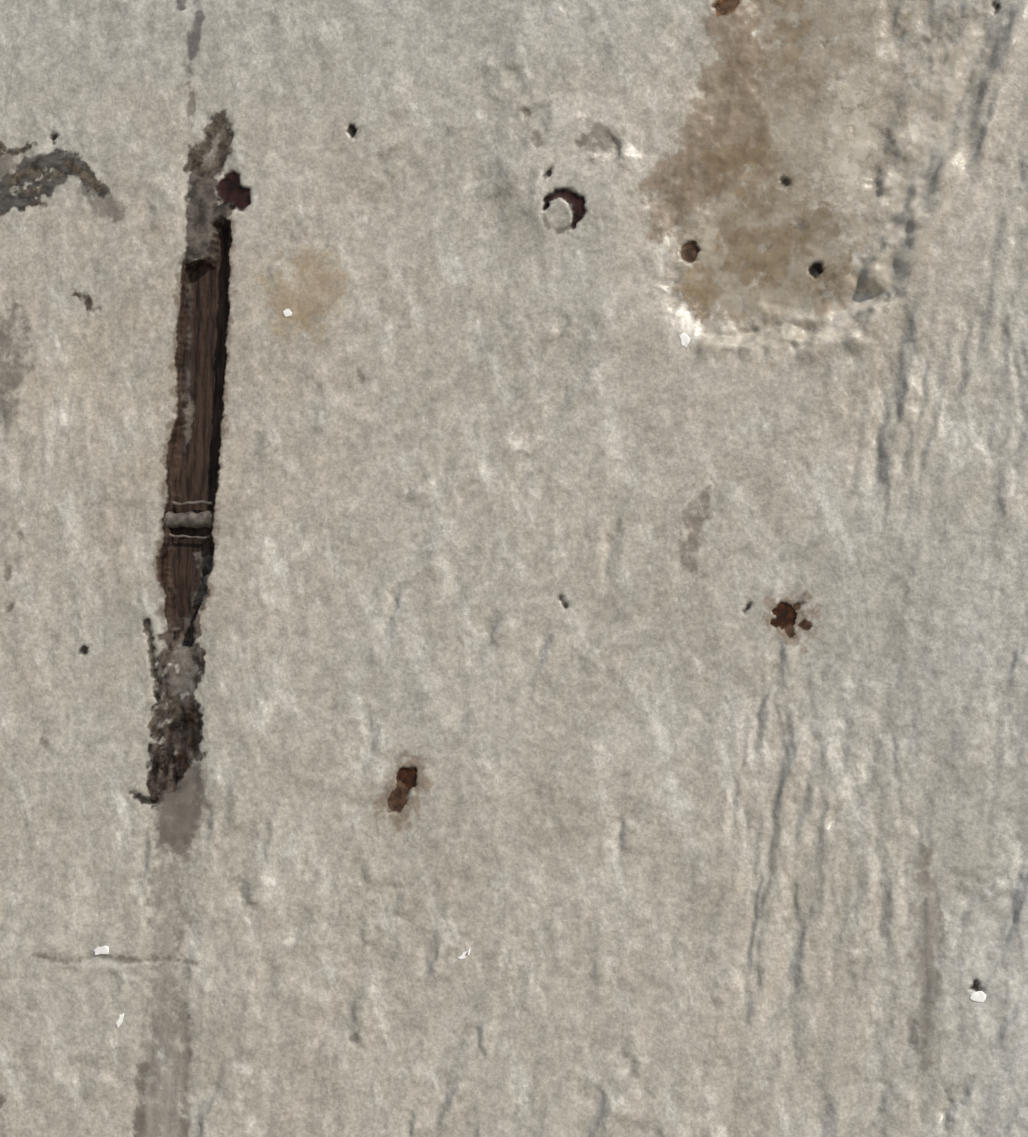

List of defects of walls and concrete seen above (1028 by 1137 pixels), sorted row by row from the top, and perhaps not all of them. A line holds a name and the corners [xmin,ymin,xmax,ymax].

rust [714,0,739,16]
peeling [183,110,234,264]
rust [216,171,251,211]